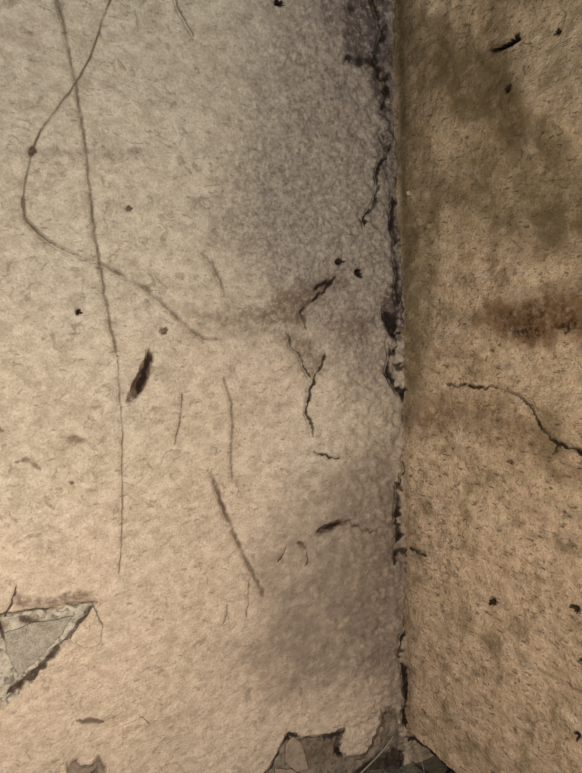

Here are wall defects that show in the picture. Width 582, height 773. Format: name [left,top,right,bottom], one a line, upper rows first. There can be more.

crack [344,0,390,112]
water stain [430,26,529,137]
crack [285,276,340,459]
crack [362,134,406,401]
water stain [475,292,582,344]
crack [445,383,582,457]
crack [277,542,308,566]
crack [344,461,427,571]
flaking render [0,602,102,705]
crack [397,630,408,729]
flaking render [67,757,105,773]
peeling [266,708,456,773]